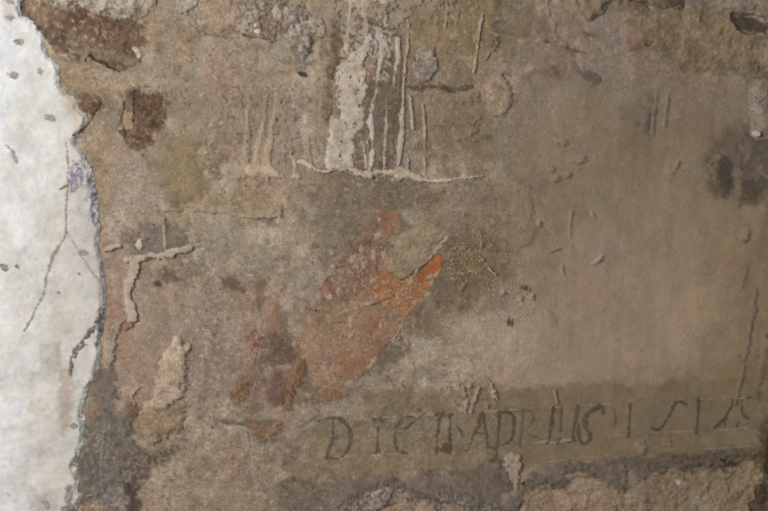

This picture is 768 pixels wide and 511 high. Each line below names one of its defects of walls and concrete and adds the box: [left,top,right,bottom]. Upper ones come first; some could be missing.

spalling [5,0,146,72]
spalling [116,87,168,157]
leakage [238,0,483,183]
flaking render [67,155,98,225]
crack [23,101,103,375]
flaking render [61,485,74,511]
spalling [338,480,506,511]
spalling [503,452,763,511]
leakage [750,419,768,511]